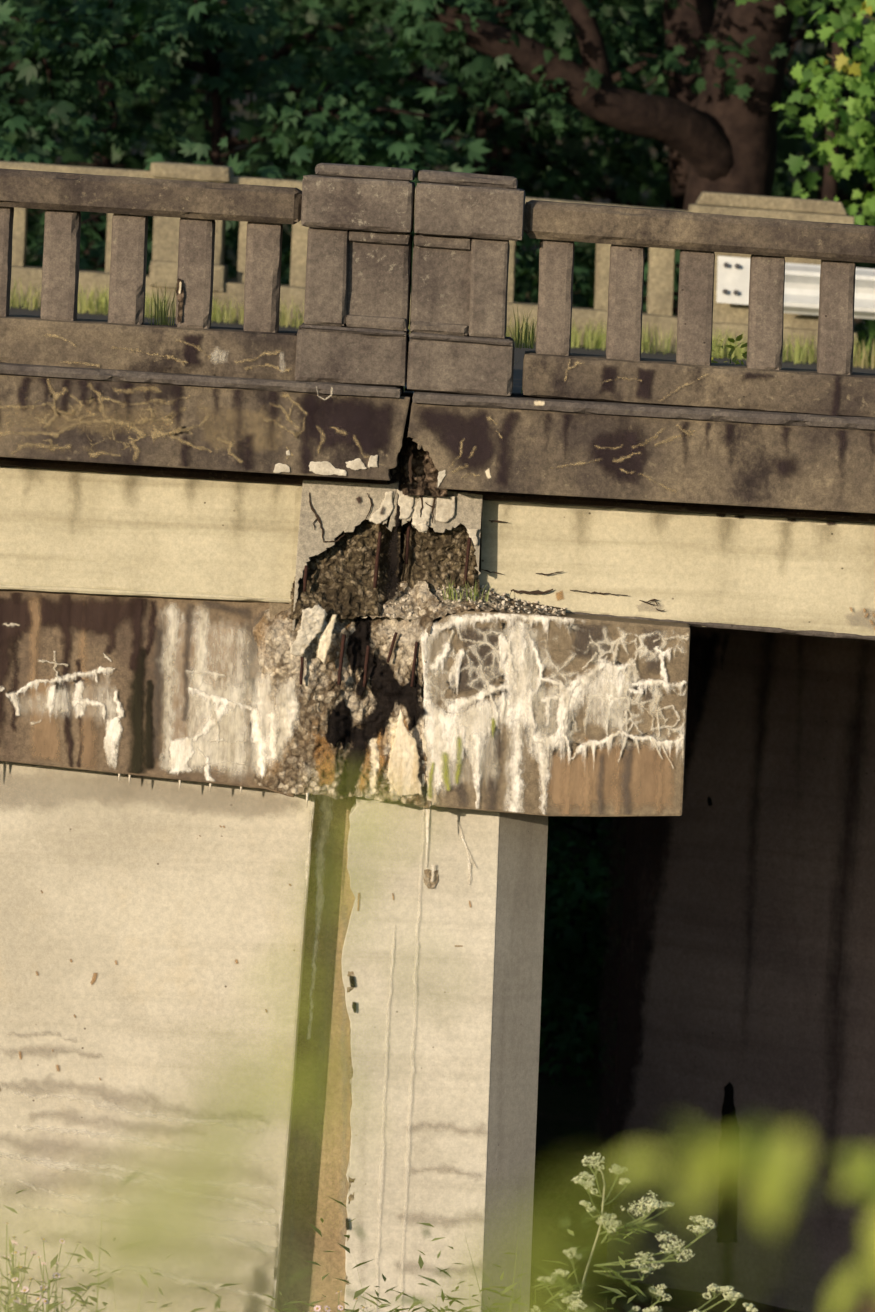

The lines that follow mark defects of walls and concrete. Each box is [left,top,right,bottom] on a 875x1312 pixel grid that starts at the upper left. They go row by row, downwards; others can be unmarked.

crack [0,335,242,462]
crack [167,342,366,458]
leakage [420,408,518,485]
leakage [601,367,617,391]
leakage [593,430,646,482]
leakage [637,369,654,399]
leakage [832,376,846,456]
spalling [253,428,482,808]
leakage [0,593,297,791]
rust [315,735,335,785]
rust [359,732,390,790]
leakage [306,613,727,1217]